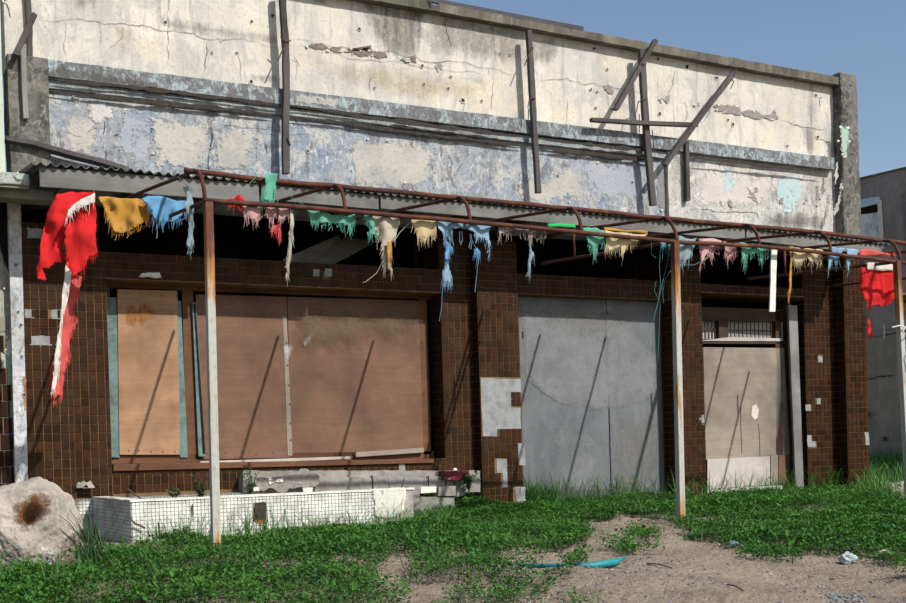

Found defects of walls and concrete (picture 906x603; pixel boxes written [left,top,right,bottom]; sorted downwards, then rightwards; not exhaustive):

crack [36,0,507,110]
spalling [305,43,387,59]
peeling [65,102,258,170]
peeling [296,94,339,106]
peeling [306,120,345,131]
peeling [351,138,437,191]
peeling [514,155,666,213]
peeling [698,168,822,213]
peeling [831,126,851,216]
spalling [0,202,18,271]
peeling [481,378,521,436]
peeling [497,459,526,502]